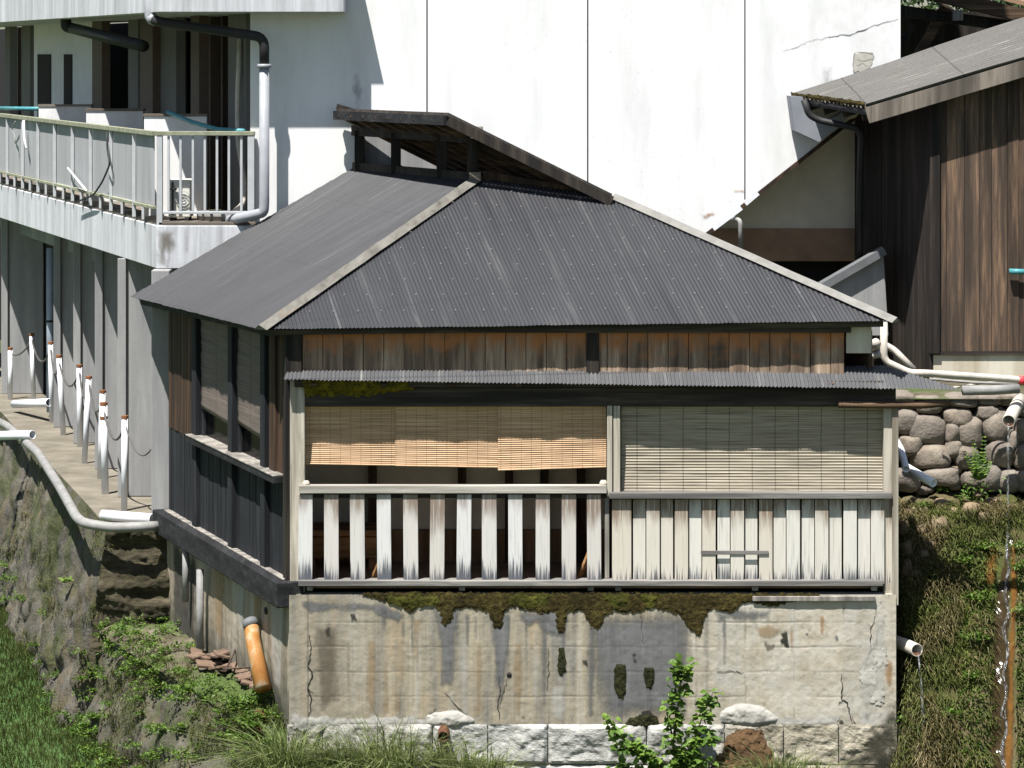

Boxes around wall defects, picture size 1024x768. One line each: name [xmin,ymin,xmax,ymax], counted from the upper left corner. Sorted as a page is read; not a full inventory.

crack [785,18,899,51]
crack [307,635,322,717]
damp [319,630,334,704]
damp [303,601,402,620]
damp [436,612,468,684]
damp [493,616,509,691]
crack [497,678,508,717]
damp [522,612,564,670]
damp [589,615,688,714]
crack [839,614,879,724]